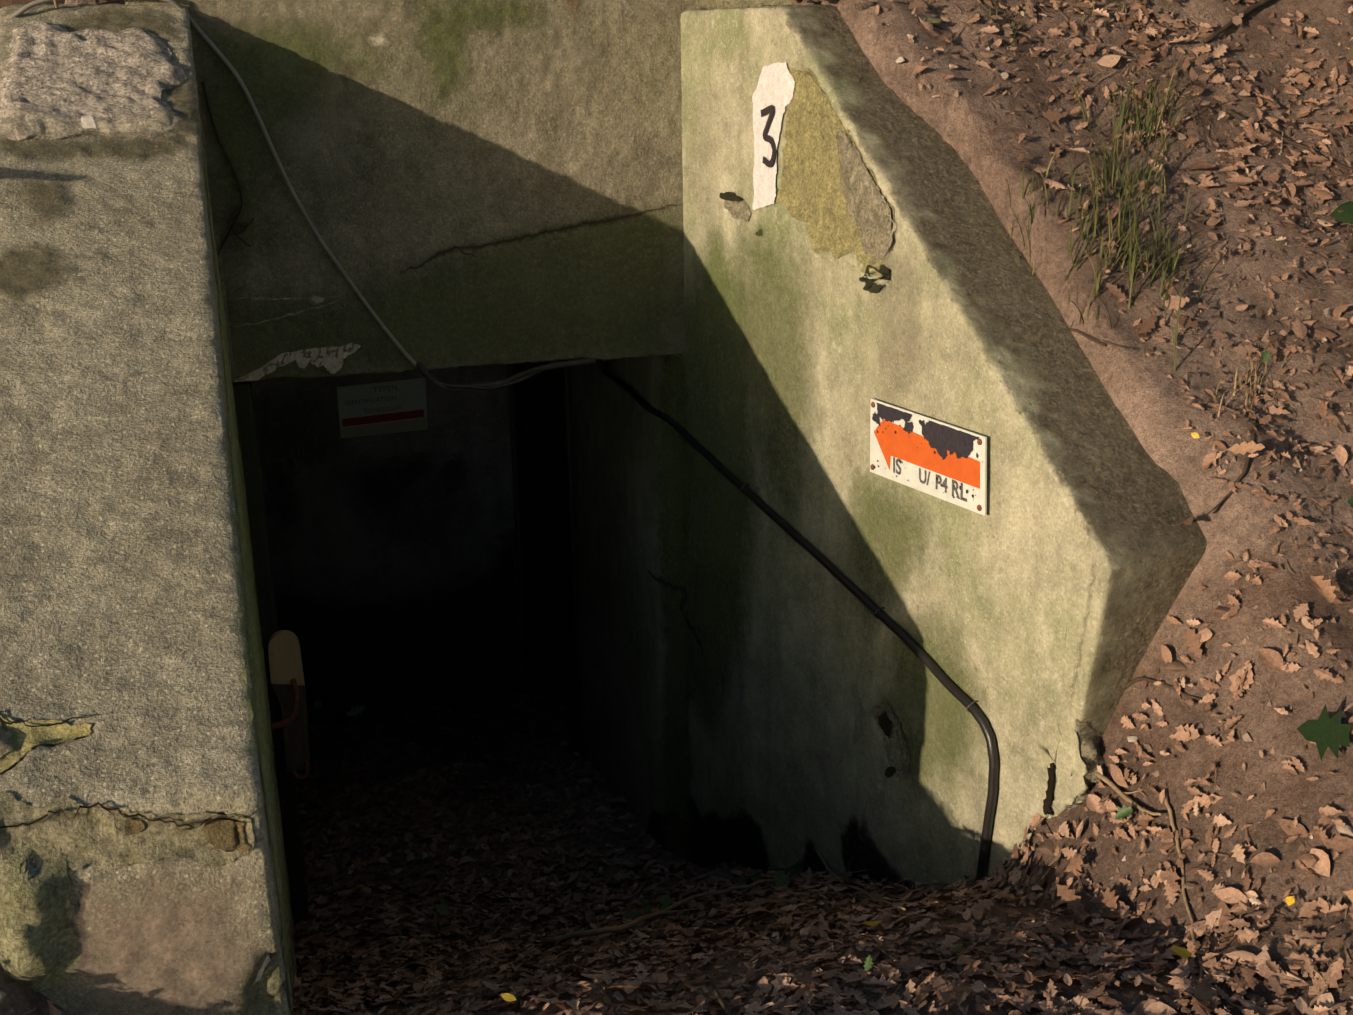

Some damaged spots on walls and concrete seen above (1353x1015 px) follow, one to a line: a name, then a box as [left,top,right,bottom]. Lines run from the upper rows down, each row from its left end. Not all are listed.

spalling [776,68,895,293]
crack [400,204,681,273]
peeling [234,343,360,382]
spalling [0,714,102,773]
peeling [872,701,910,780]
crack [0,802,250,831]
spalling [0,791,254,878]
damp [646,801,770,874]
damp [802,819,915,889]